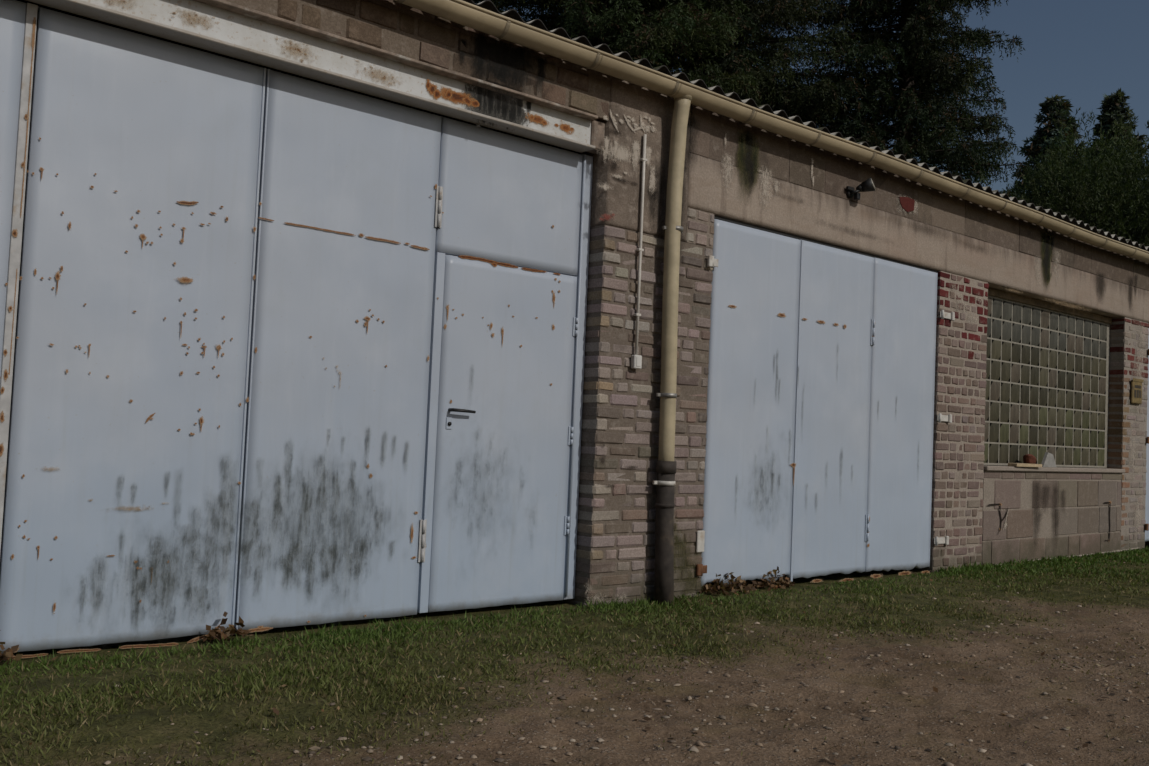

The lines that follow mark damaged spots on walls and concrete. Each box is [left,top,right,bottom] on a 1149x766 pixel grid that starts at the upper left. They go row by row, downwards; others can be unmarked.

corrosion [426,79,479,107]
damp [460,37,546,129]
corrosion [525,114,575,134]
damp [723,133,778,209]
corrosion [131,210,186,248]
corrosion [177,201,228,226]
damp [1035,232,1058,286]
corrosion [180,298,233,377]
damp [1034,485,1065,537]